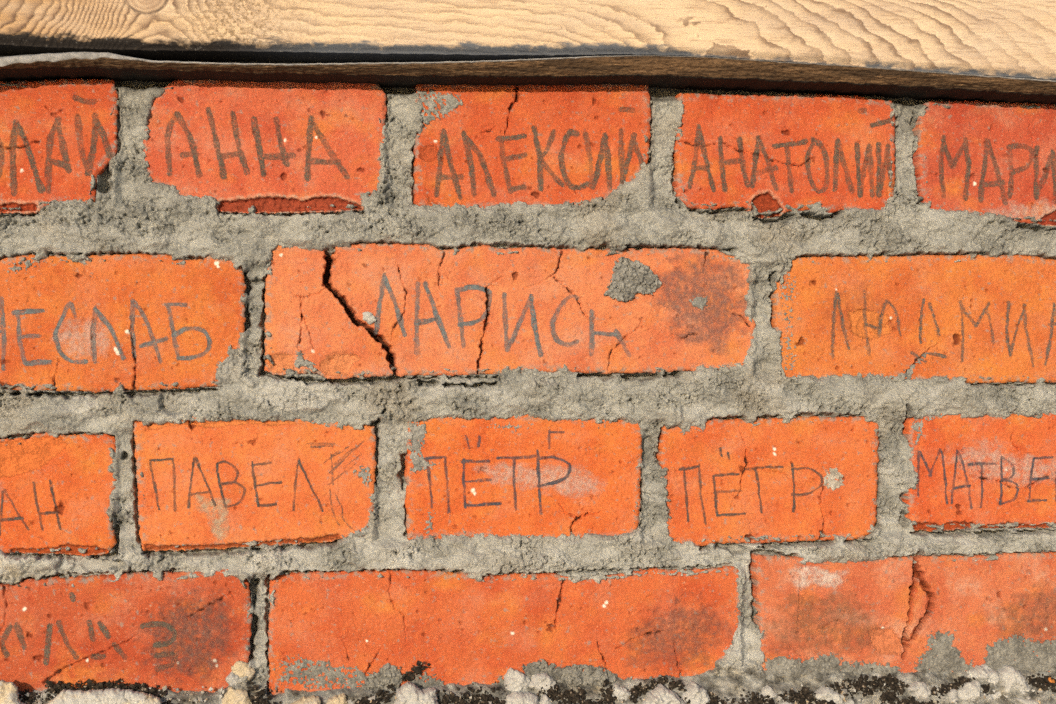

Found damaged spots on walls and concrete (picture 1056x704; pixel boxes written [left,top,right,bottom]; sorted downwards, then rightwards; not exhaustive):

crack [487,86,518,134]
spalling [0,203,37,212]
spalling [218,197,362,213]
spalling [751,192,782,217]
crack [323,256,408,374]
crack [901,564,931,645]